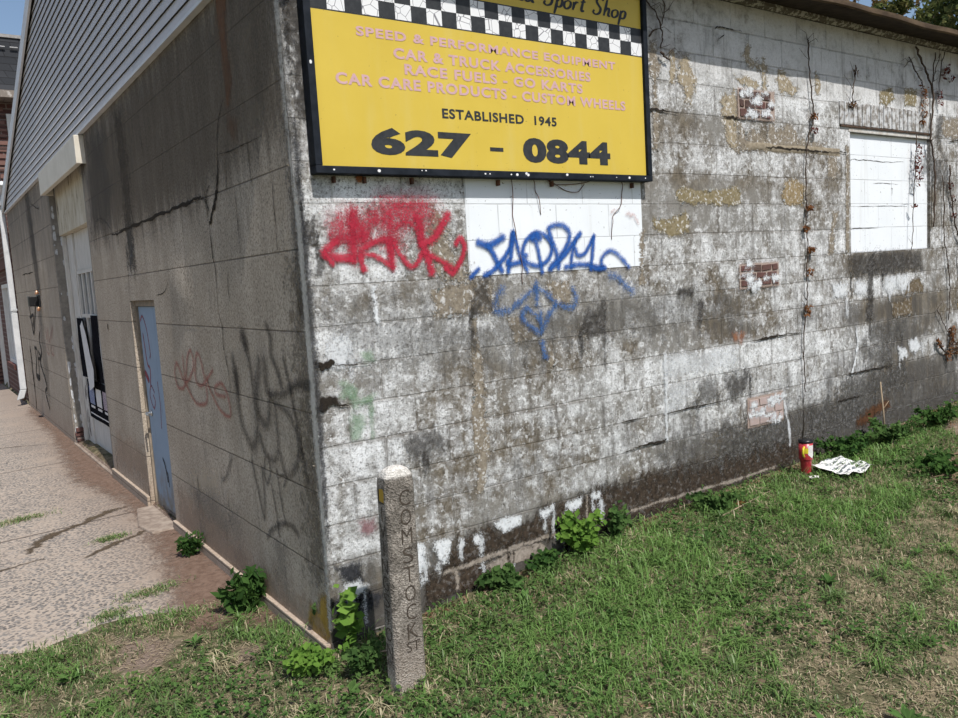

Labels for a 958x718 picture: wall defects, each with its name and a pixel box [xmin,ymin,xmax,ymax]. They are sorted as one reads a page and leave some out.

peeling [719,44,850,257]
peeling [941,115,958,140]
crack [99,100,277,393]
flaking render [739,258,780,292]
damp [404,429,447,465]
damp [420,250,924,609]
flaking render [747,390,787,429]
damp [331,560,383,624]